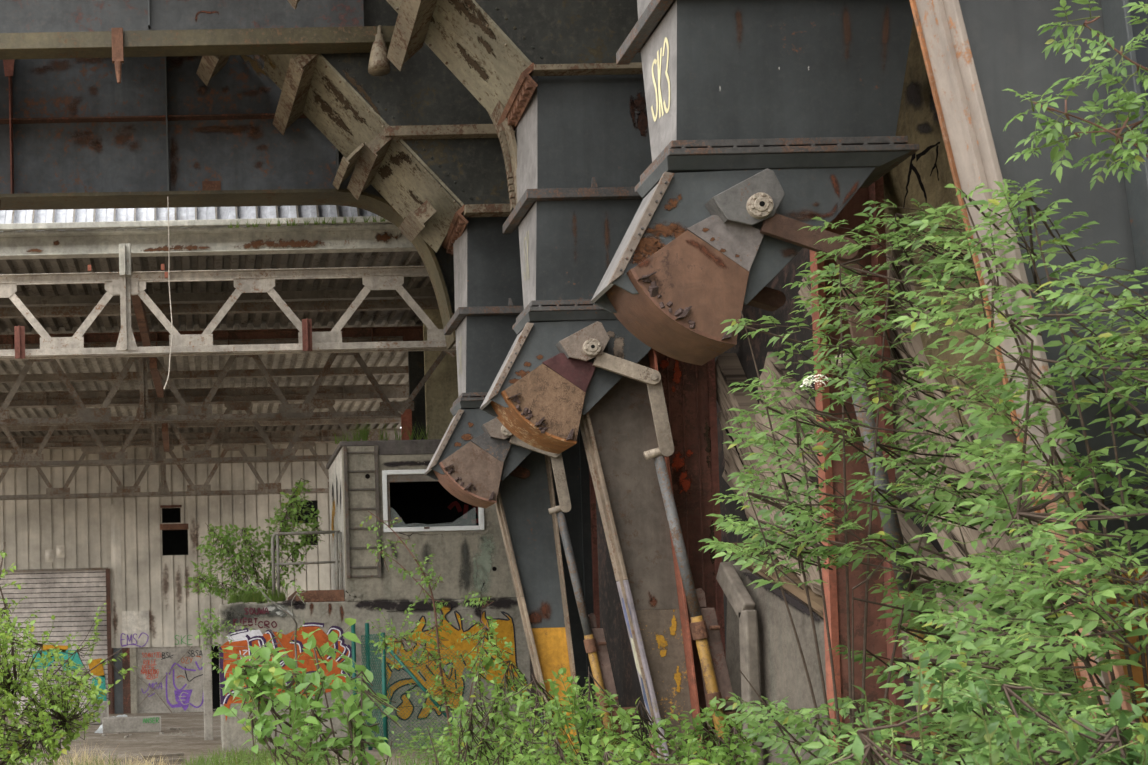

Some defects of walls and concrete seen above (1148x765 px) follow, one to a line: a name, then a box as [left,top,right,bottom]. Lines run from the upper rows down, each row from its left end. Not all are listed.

peeling [448,0,496,58]
peeling [457,43,489,82]
peeling [313,70,381,136]
peeling [377,151,420,179]
crack [903,142,940,208]
rust [234,239,324,249]
rust [375,231,399,243]
rust [630,194,739,267]